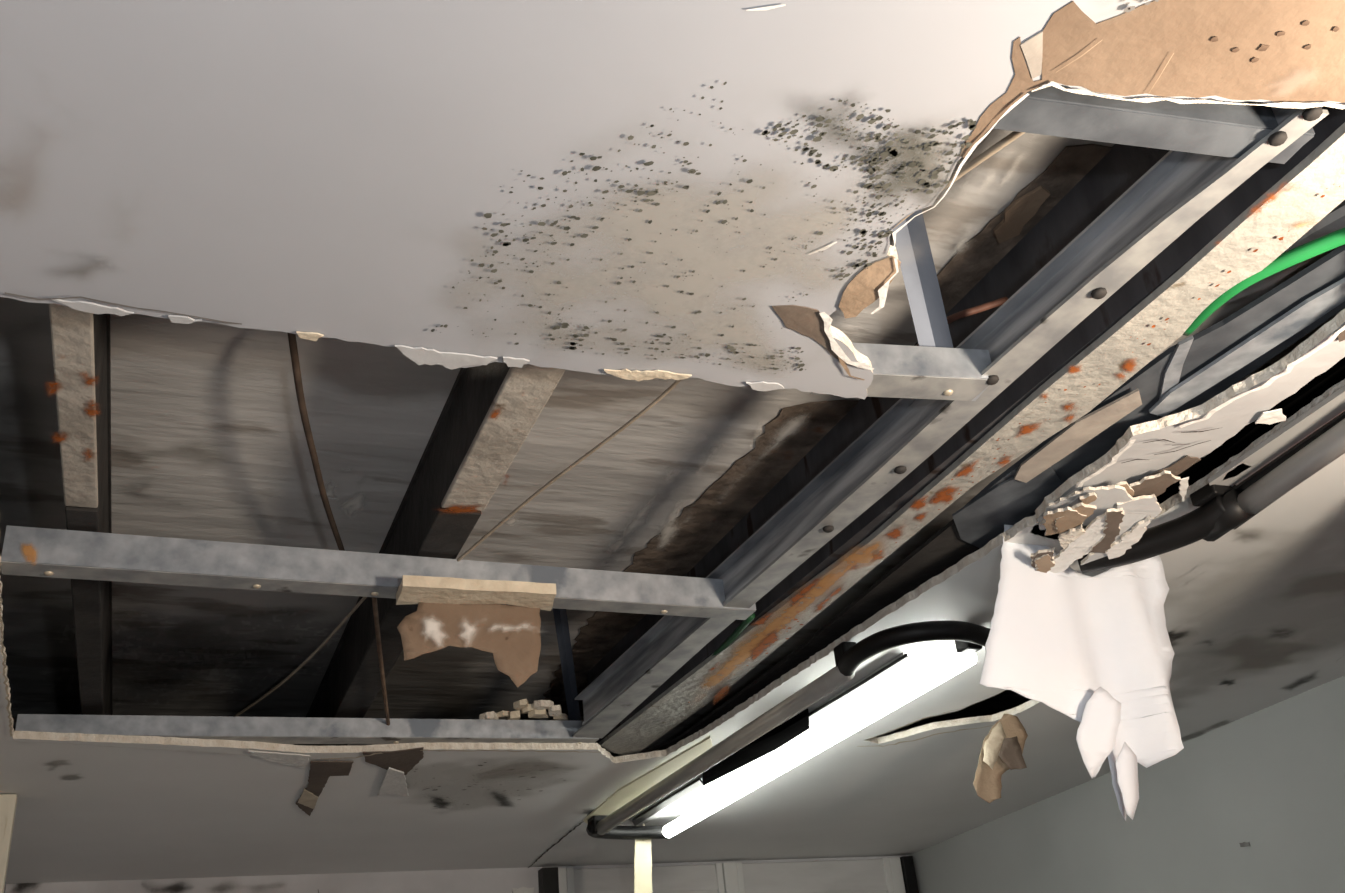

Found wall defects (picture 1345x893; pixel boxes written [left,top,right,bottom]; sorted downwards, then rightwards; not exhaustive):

mould [431,82,977,374]
peeling [772,0,1345,380]
peeling [4,292,242,325]
peeling [395,345,530,370]
peeling [604,369,692,382]
corrosion [1064,366,1100,421]
corrosion [1117,318,1169,379]
peeling [1255,408,1286,425]
spalling [623,400,859,576]
corrosion [703,419,1050,703]
peeling [1030,455,1201,573]
spalling [542,611,646,717]